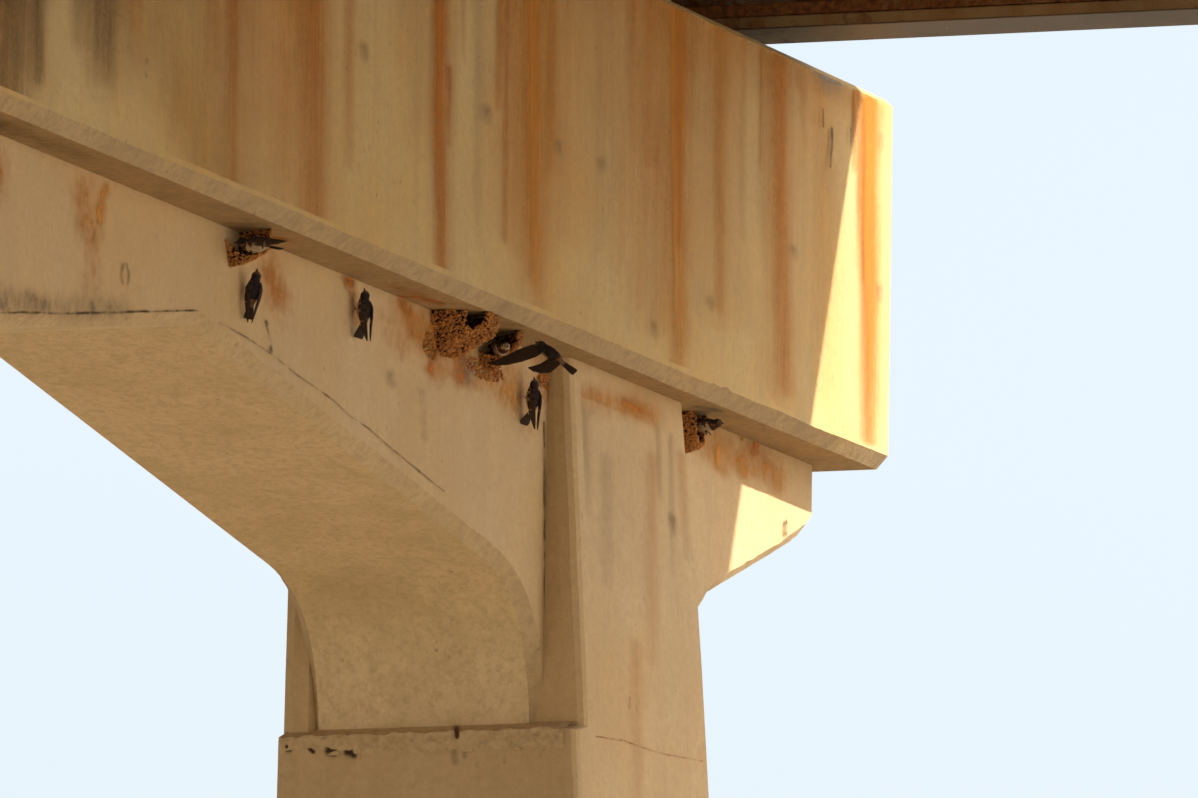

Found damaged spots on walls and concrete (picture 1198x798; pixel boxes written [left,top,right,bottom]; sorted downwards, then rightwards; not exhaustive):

corrosion [436,0,450,245]
corrosion [669,5,688,355]
corrosion [855,90,877,437]
spalling [308,747,356,758]